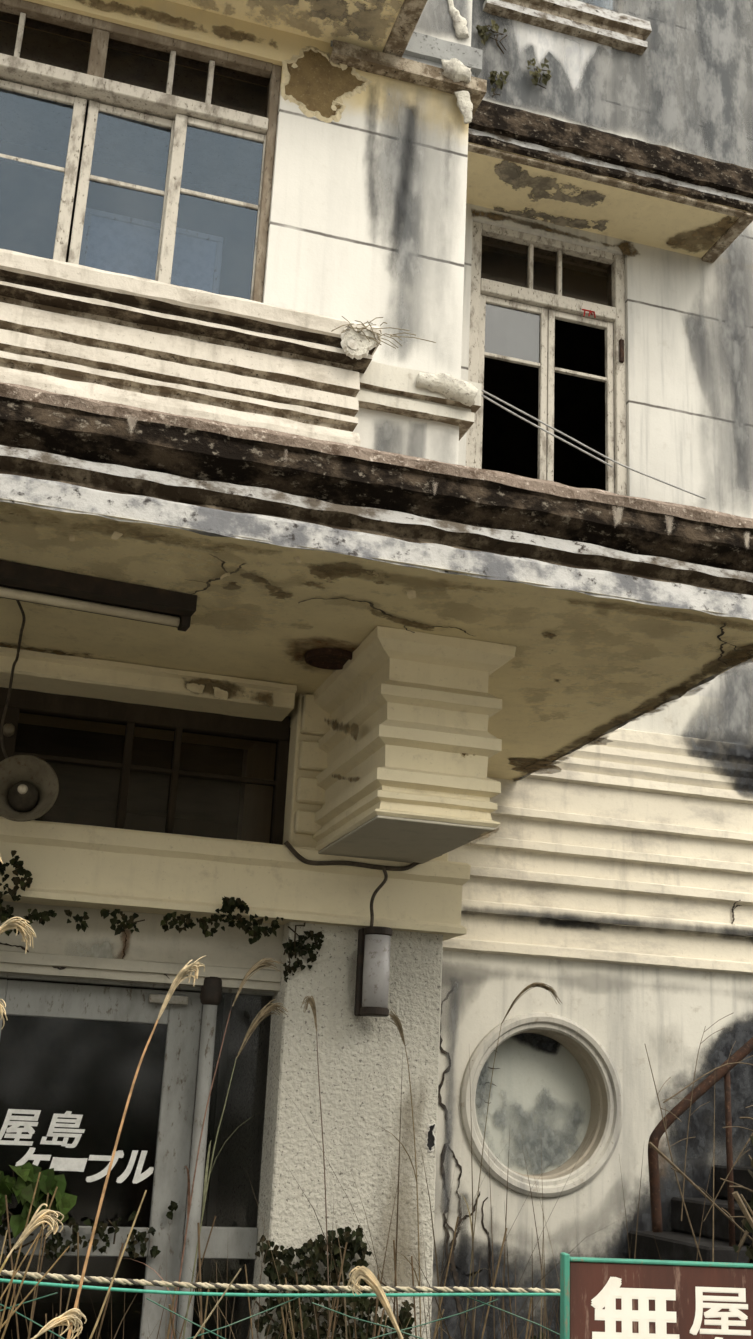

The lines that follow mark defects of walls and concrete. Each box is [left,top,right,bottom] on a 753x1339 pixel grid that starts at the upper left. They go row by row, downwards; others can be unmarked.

flaking render [76,0,401,123]
leakage [370,89,424,348]
peeling [471,160,639,257]
leakage [376,421,400,453]
crack [185,554,246,594]
crack [298,597,473,636]
leakage [684,665,753,796]
leakage [462,909,753,940]
leakage [451,981,459,1052]
leakage [431,1015,753,1339]
leakage [379,1227,416,1286]